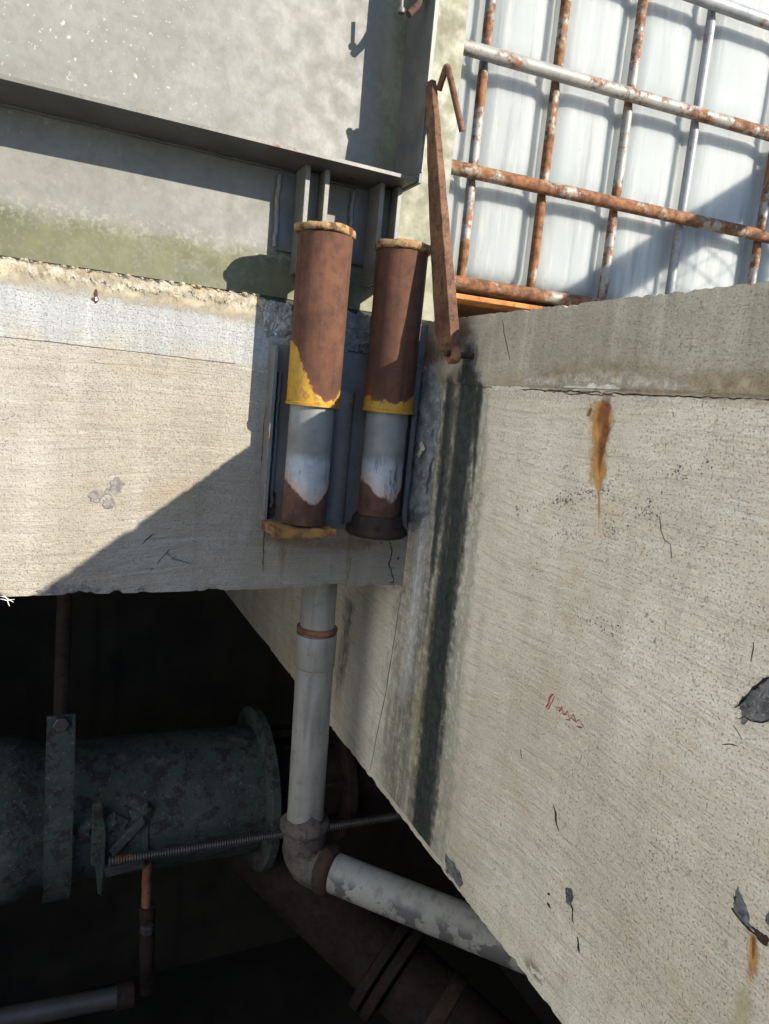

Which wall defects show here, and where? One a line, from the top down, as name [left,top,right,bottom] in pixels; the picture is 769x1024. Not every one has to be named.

crack [477,365,769,404]
corrosion [587,401,611,514]
peeling [88,476,128,509]
water stain [386,330,487,861]
spalling [734,677,769,724]
spalling [445,853,463,888]
spalling [731,887,769,946]
corrosion [749,934,757,974]